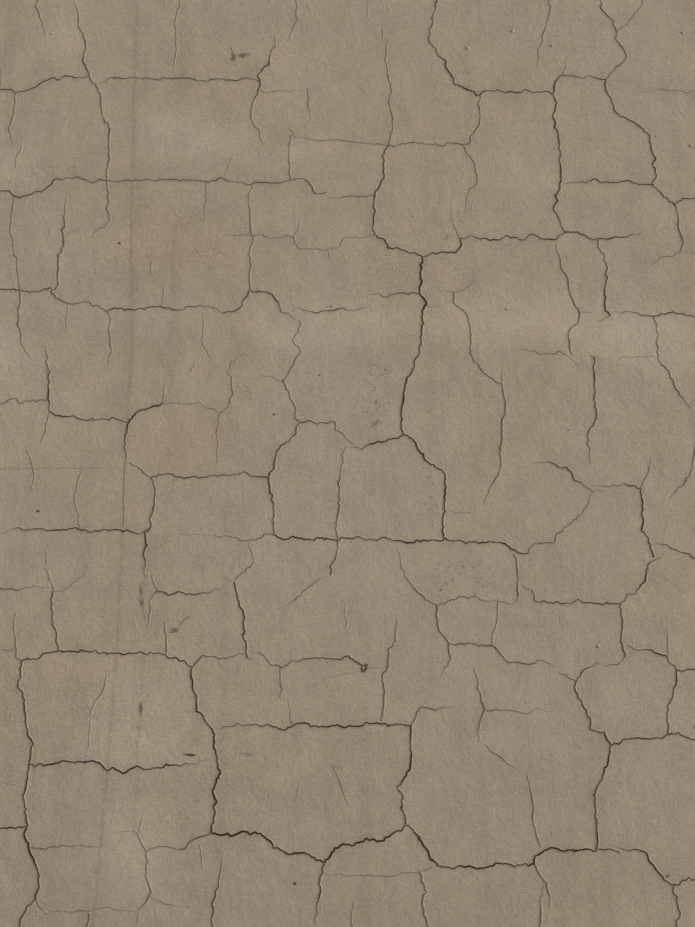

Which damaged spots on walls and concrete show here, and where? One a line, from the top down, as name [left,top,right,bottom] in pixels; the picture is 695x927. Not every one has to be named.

crack [0,0,695,366]
crack [0,257,695,927]